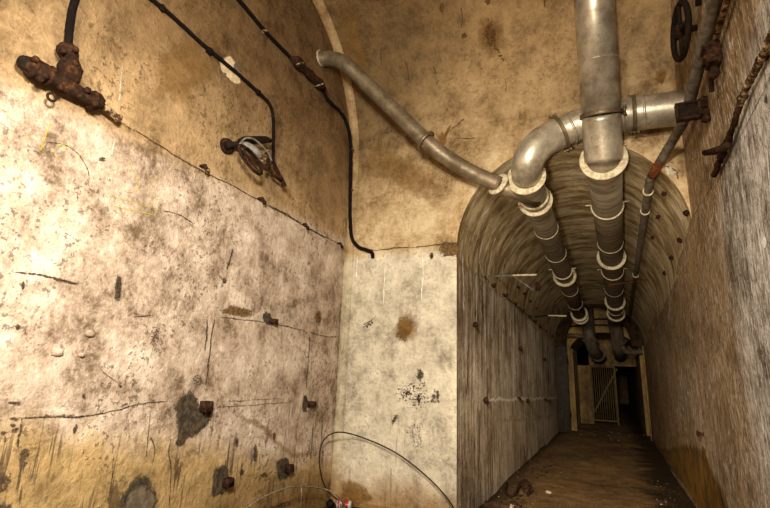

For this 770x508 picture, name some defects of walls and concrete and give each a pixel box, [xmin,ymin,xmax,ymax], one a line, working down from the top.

crack [122,123,335,242]
crack [16,272,77,284]
corrosion [396,317,414,341]
damp [392,369,440,410]
damp [175,375,212,446]
crack [10,401,172,507]
damp [108,475,158,508]
damp [212,465,229,497]
damp [276,458,290,479]